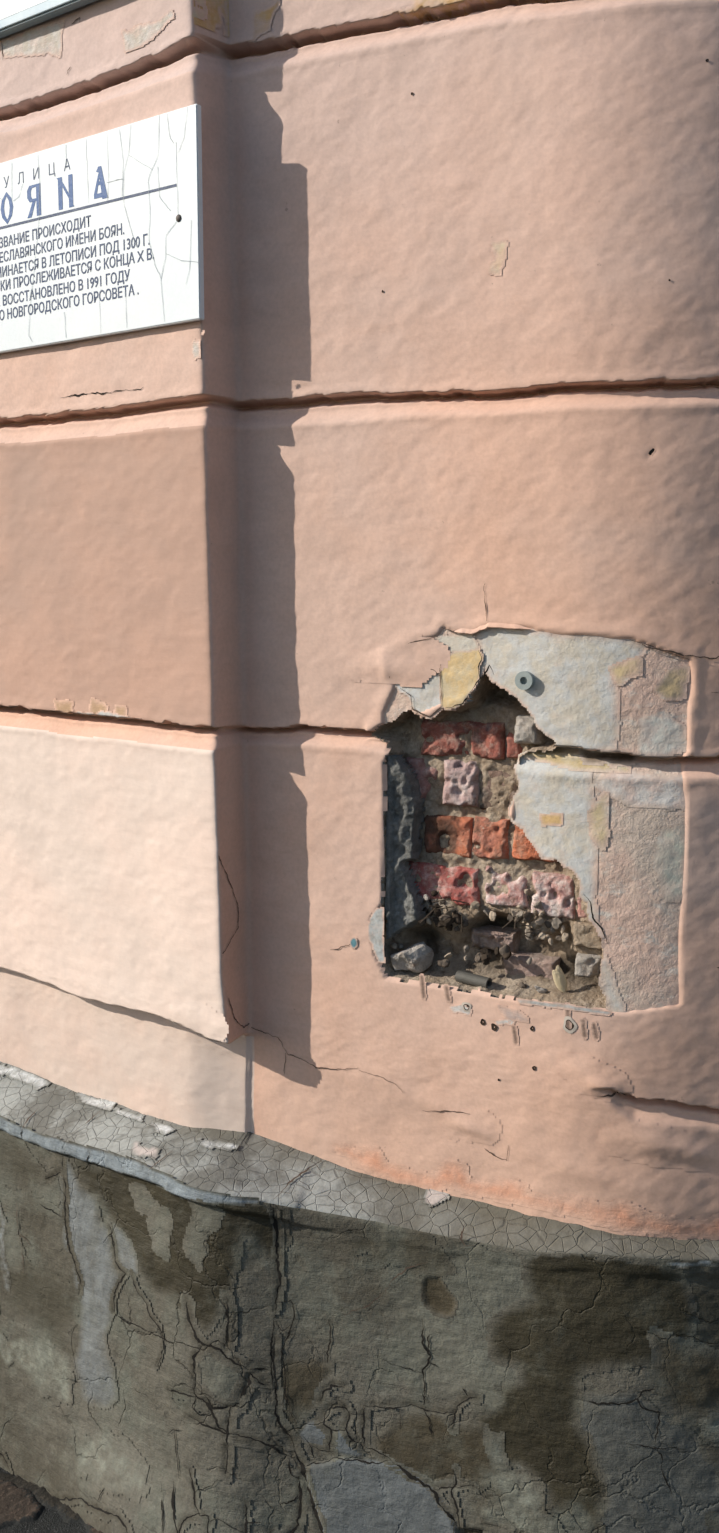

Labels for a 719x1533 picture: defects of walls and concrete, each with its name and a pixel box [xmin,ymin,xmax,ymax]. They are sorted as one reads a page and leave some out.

peeling [380,0,571,27]
peeling [368,622,691,1031]
crack [0,1111,483,1533]
damp [370,1253,719,1533]
crack [574,1389,684,1495]